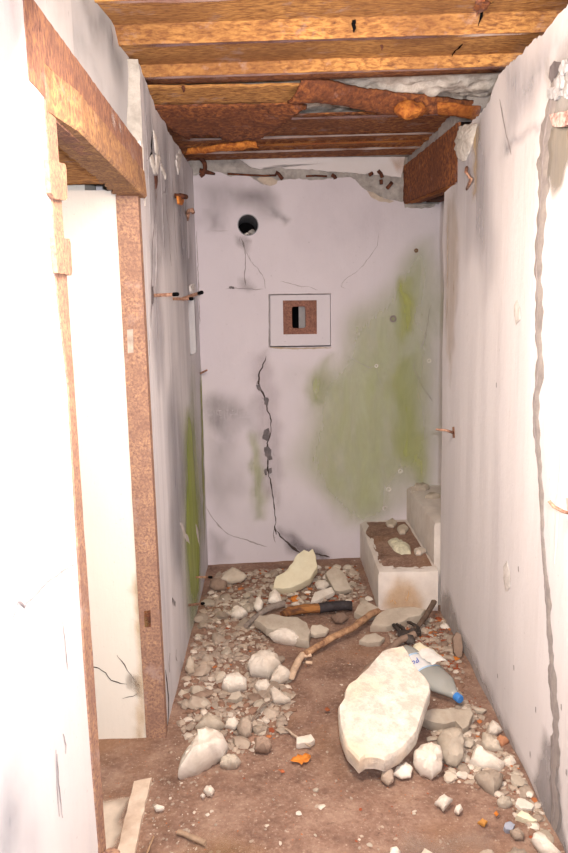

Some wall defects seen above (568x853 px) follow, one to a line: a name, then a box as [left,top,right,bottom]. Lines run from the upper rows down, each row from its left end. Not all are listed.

spalling [331,73,500,99]
spalling [547,59,568,101]
rust [185,140,259,155]
rust [437,102,481,193]
spalling [127,59,408,284]
crack [206,358,329,559]
crack [94,656,137,698]